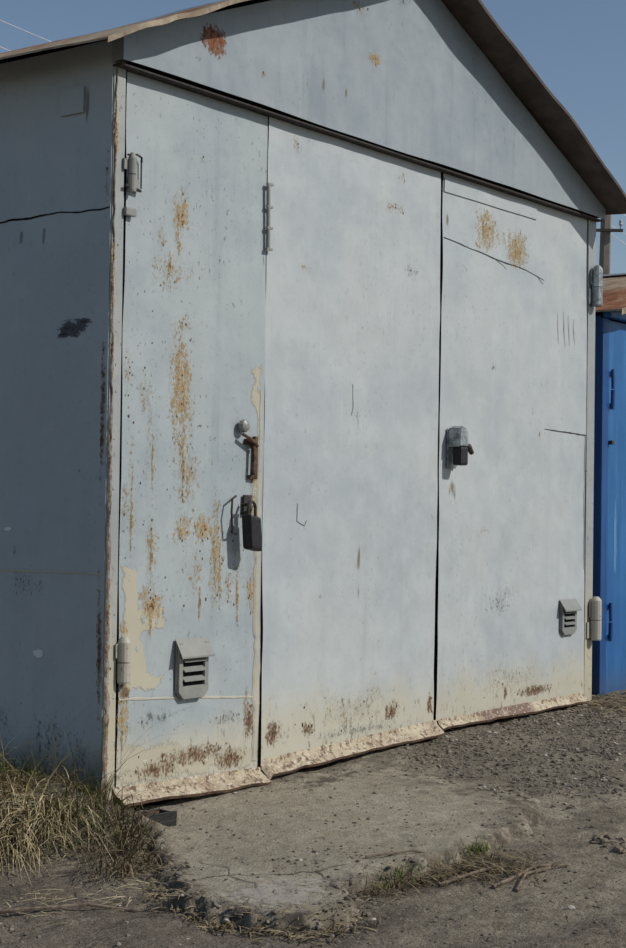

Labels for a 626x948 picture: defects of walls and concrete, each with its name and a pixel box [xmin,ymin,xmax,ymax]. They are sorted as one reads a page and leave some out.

rust [201,23,227,58]
crack [0,206,110,244]
crack [444,237,543,284]
water stain [58,318,92,338]
rust [167,317,200,503]
rust [120,466,164,634]
rust [173,487,255,621]
peeling [122,566,164,691]
rust [492,666,552,697]
rust [243,690,253,737]
rust [265,721,280,745]
rust [125,742,246,781]